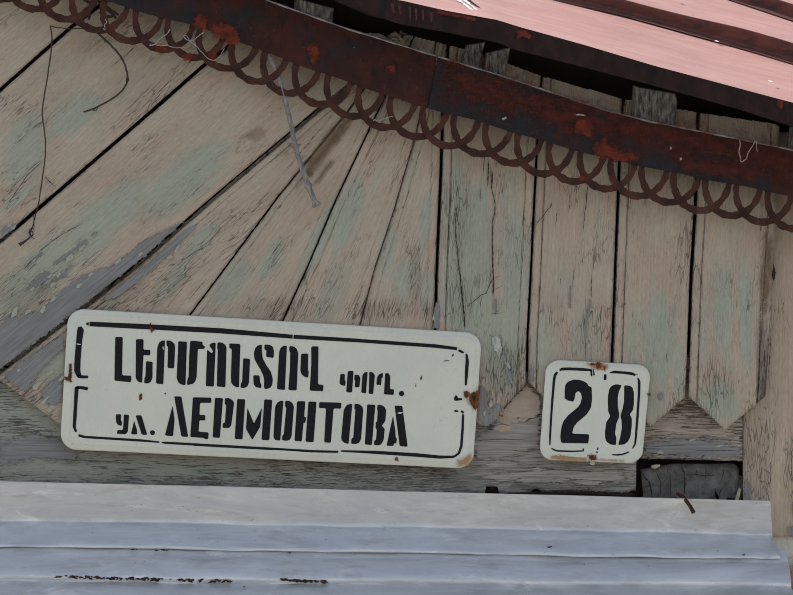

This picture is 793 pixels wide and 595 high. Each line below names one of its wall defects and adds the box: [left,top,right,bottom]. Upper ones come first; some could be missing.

corrosion [193,14,240,48]
corrosion [437,9,476,21]
corrosion [439,59,793,172]
crack [455,157,502,329]
peeling [0,222,197,412]
corrosion [464,386,481,410]
peeling [474,365,626,487]